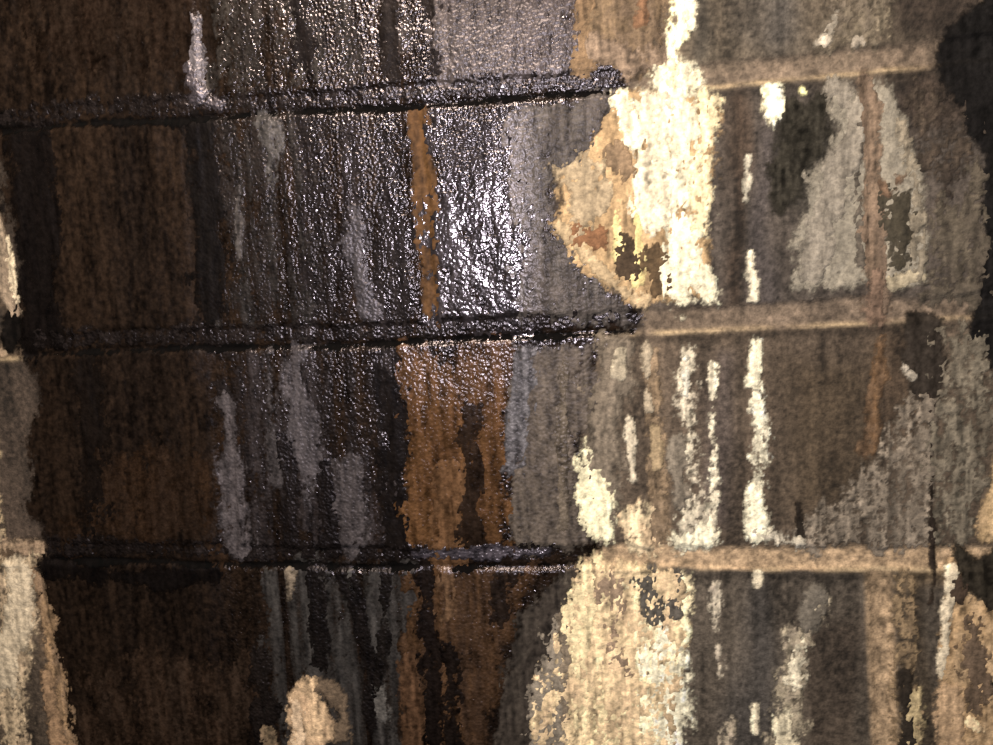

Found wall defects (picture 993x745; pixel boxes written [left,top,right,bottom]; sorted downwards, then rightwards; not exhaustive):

water stain [0,0,722,745]
corrosion [407,105,441,329]
water stain [742,0,993,611]
water stain [886,568,926,745]